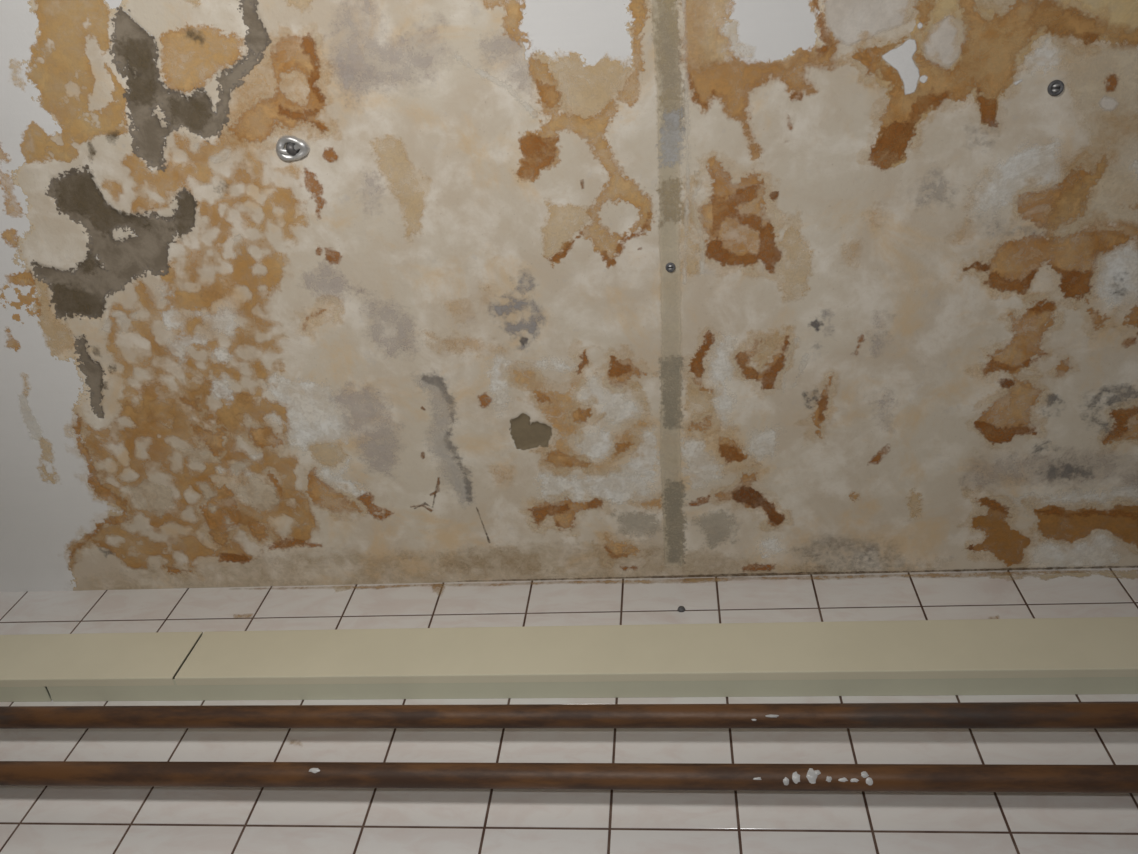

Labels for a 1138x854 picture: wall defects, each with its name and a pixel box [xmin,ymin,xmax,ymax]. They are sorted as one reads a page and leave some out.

damp [20,0,128,163]
damp [160,25,242,93]
damp [483,0,528,44]
damp [518,0,652,268]
damp [683,0,837,160]
damp [852,0,1138,303]
damp [1,228,18,247]
damp [0,272,74,354]
damp [68,36,391,574]
peeling [11,0,1138,591]
damp [488,274,660,534]
damp [1030,530,1119,570]